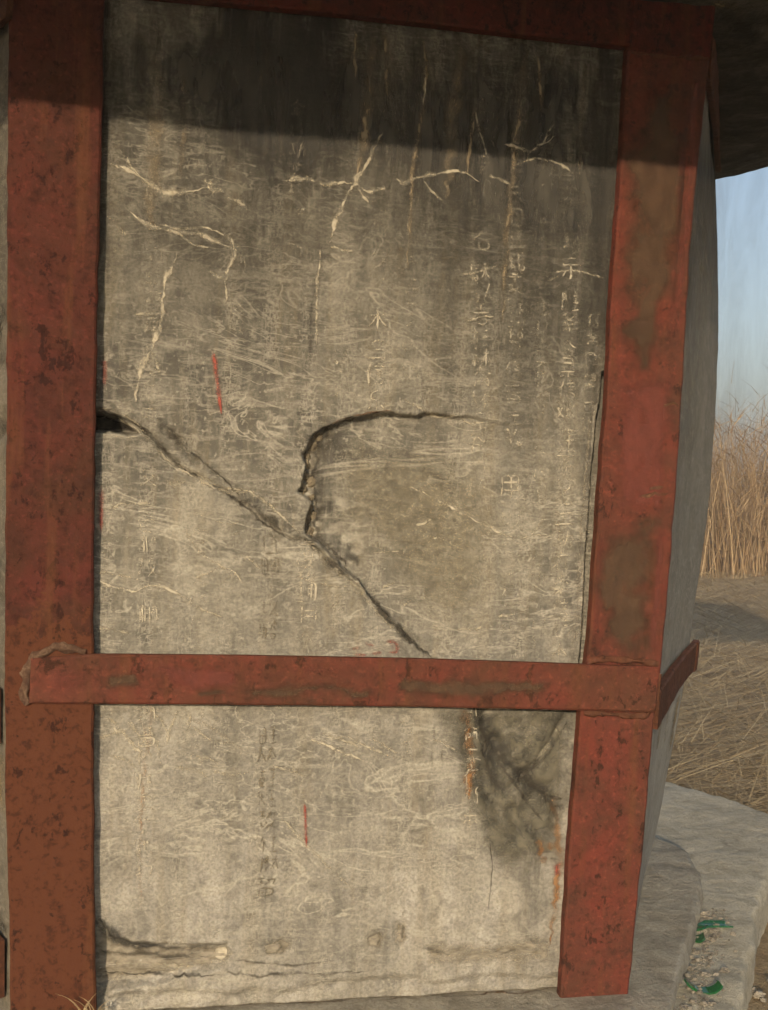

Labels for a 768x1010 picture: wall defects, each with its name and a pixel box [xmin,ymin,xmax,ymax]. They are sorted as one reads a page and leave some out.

crack [118,416,430,656]
water stain [443,710,567,861]